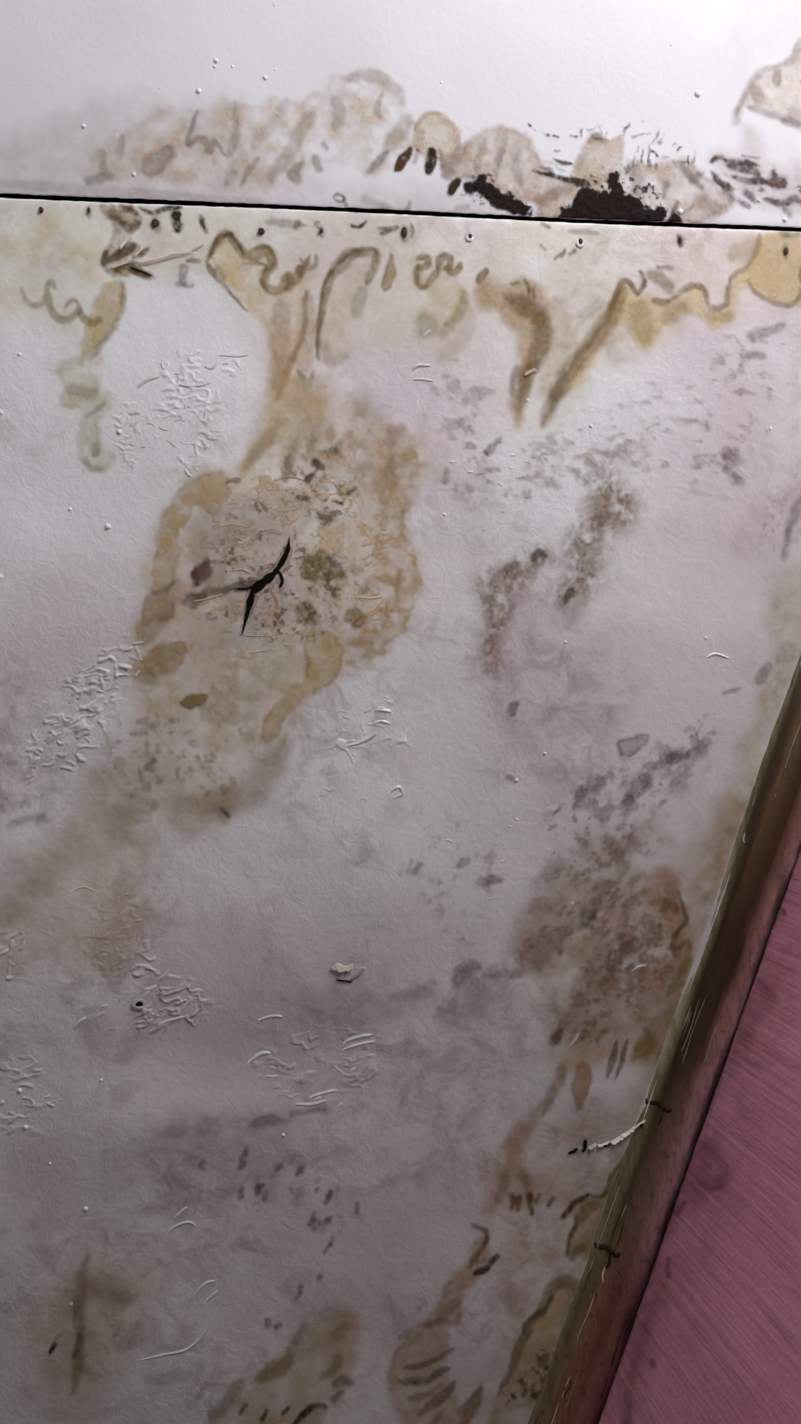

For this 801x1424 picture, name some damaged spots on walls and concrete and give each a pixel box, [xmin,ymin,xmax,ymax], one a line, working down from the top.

leakage [381,112,710,223]
leakage [677,146,801,208]
leakage [102,205,182,277]
leakage [187,218,306,298]
leakage [316,250,395,345]
leakage [415,253,462,288]
leakage [545,278,647,419]
crack [201,529,293,634]
leakage [149,449,355,634]
leakage [180,684,218,708]
peeling [567,1098,672,1154]
leakage [511,1164,620,1255]